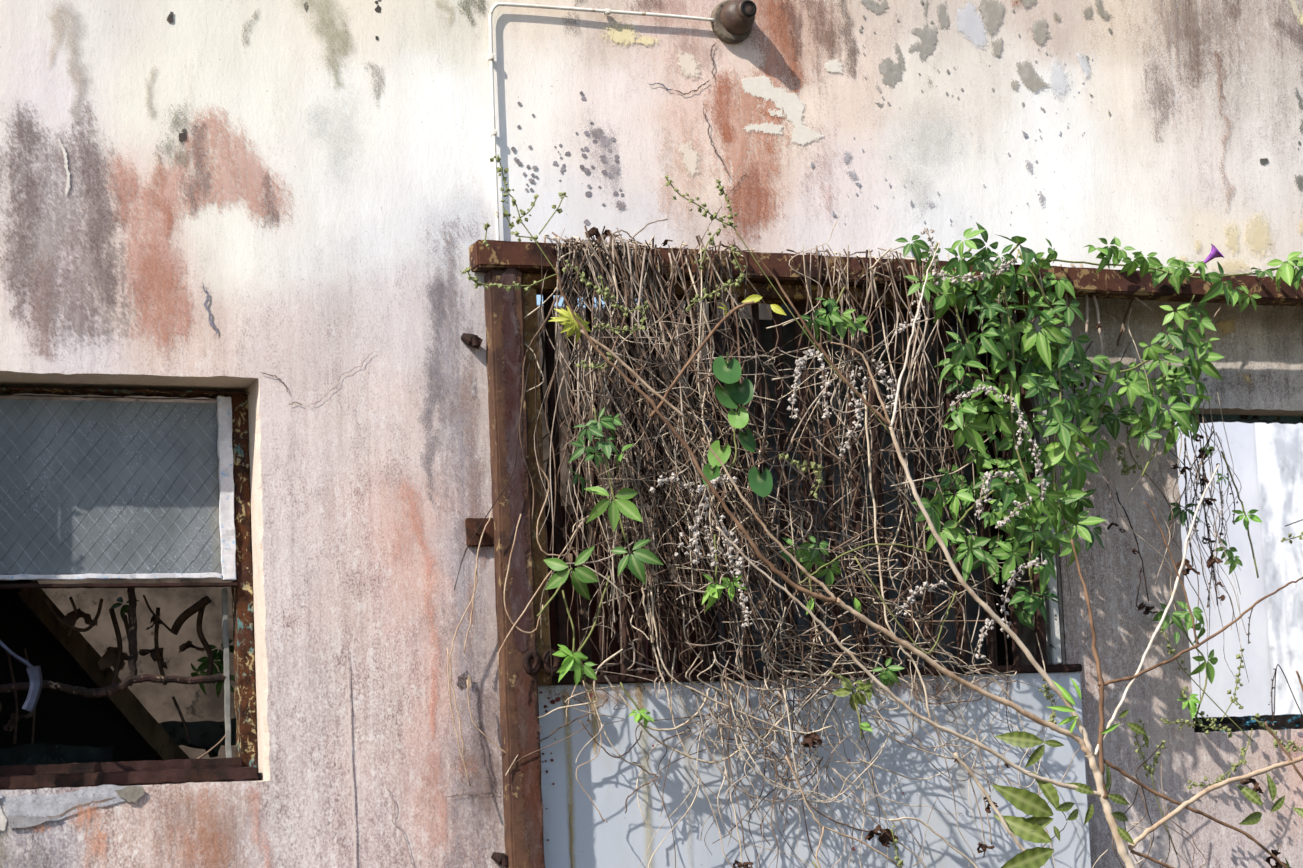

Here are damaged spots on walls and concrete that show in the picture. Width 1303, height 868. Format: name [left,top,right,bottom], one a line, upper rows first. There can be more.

water stain [0,11,144,356]
crack [649,43,747,192]
corrosion [678,0,807,245]
peeling [741,74,824,146]
peeling [859,0,1093,136]
peeling [1082,0,1113,34]
peeling [1294,87,1303,150]
crack [260,351,377,406]
water stain [420,218,498,868]
corrosion [500,268,651,868]
corrosion [859,675,1010,701]
spalling [0,785,144,831]